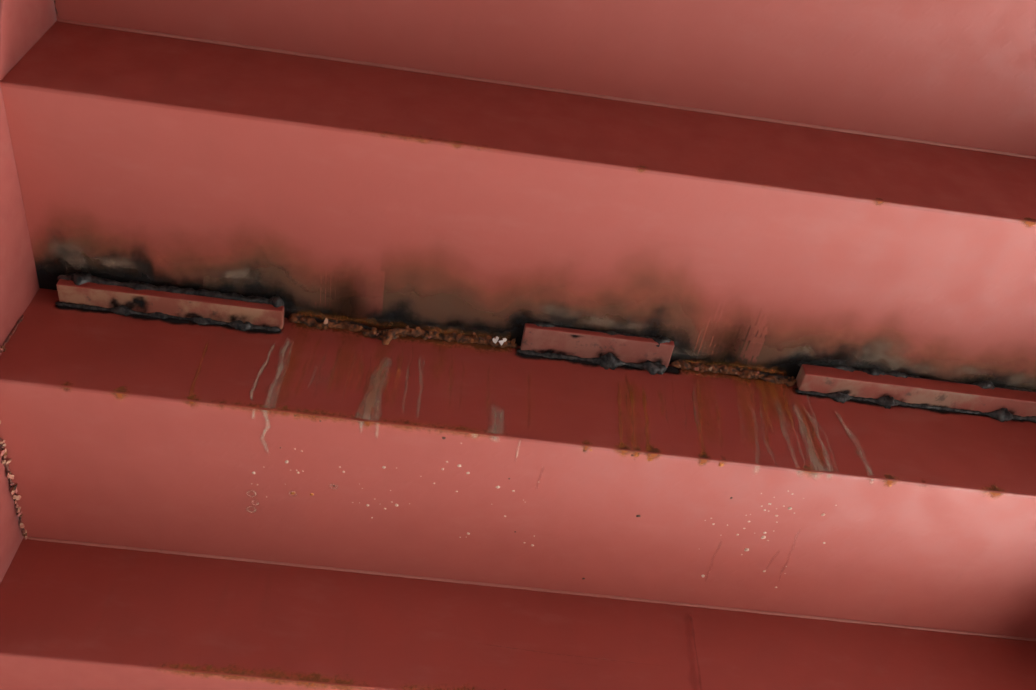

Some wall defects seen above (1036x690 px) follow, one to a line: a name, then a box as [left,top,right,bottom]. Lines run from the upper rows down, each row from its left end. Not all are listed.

damp [250,342,288,407]
peeling [0,438,28,540]
rust [170,664,352,690]